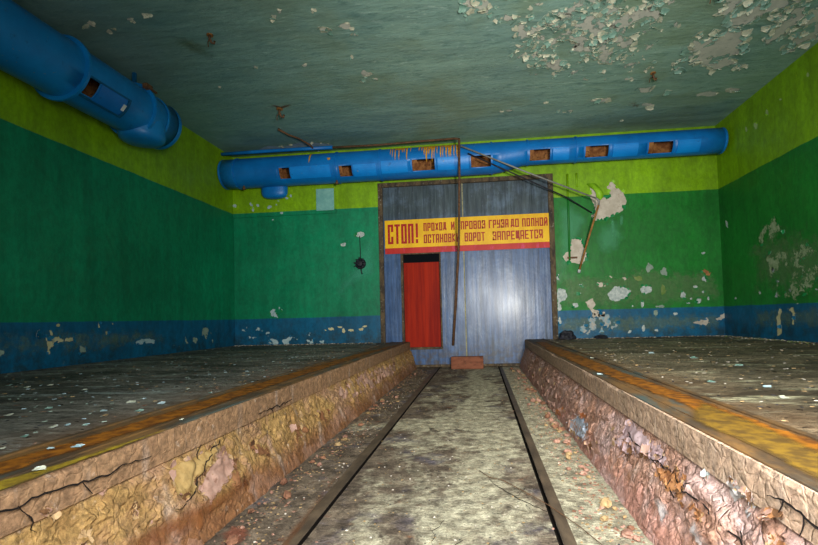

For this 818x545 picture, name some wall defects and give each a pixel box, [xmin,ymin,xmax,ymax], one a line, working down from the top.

peeling [458,0,681,93]
corrosion [390,144,458,161]
peeling [587,180,627,221]
peeling [562,237,589,265]
peeling [556,274,620,335]
flaking render [596,263,667,307]
peeling [759,217,818,336]
crack [0,456,151,533]
crack [181,439,220,509]
crack [628,432,709,515]
crack [727,530,743,545]
crack [766,495,818,536]